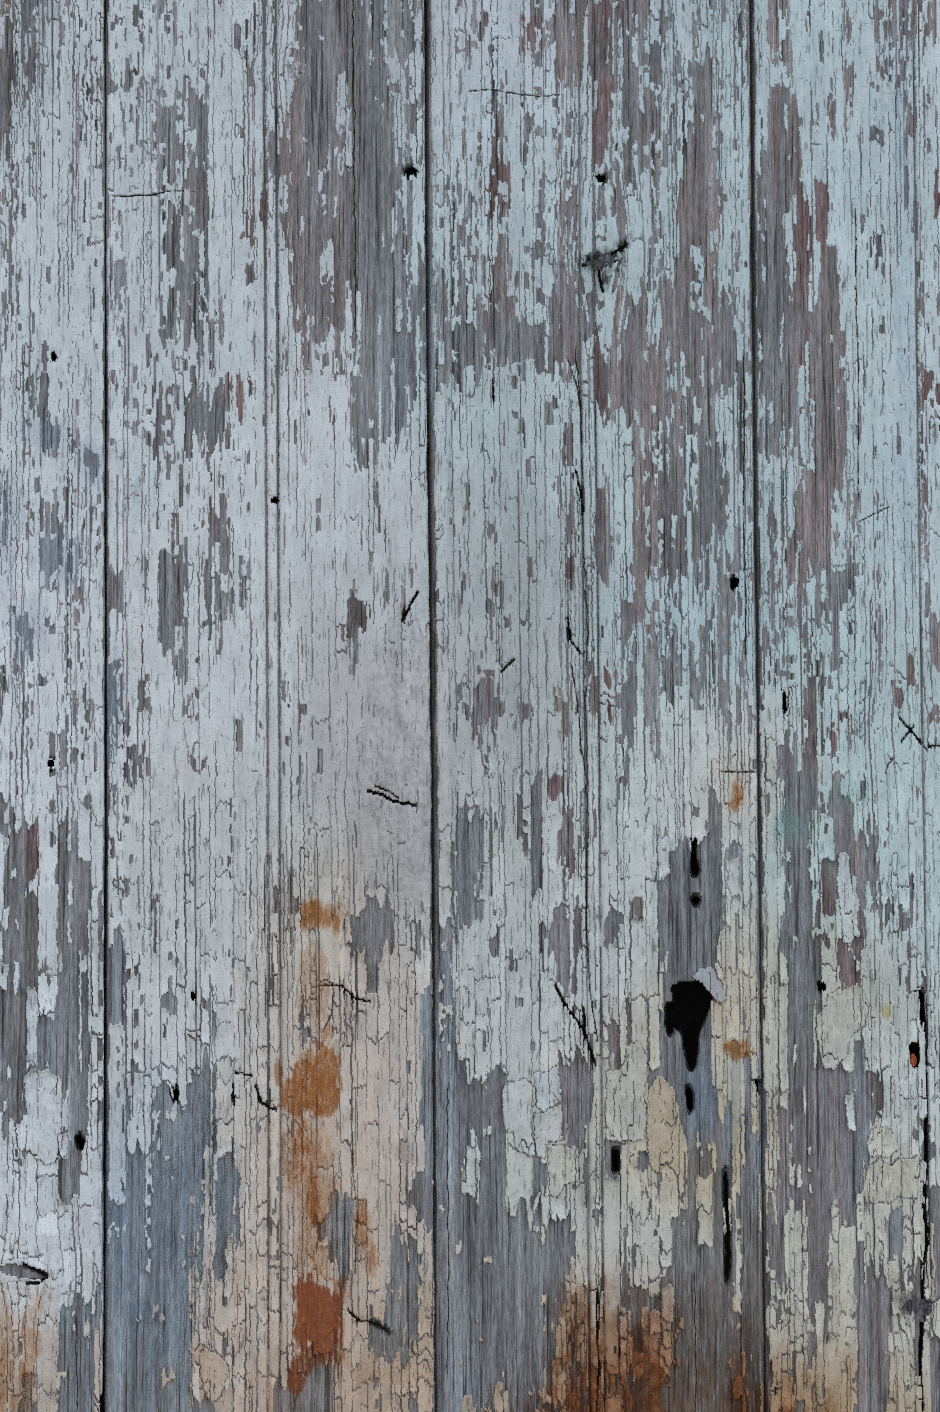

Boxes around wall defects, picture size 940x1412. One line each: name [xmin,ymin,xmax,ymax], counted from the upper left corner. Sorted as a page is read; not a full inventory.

peeling [0,0,59,154]
peeling [96,0,256,466]
crack [368,786,415,806]
crack [885,717,940,772]
peeling [0,340,255,1412]
corrosion [291,1051,339,1113]
corrosion [287,1273,344,1393]